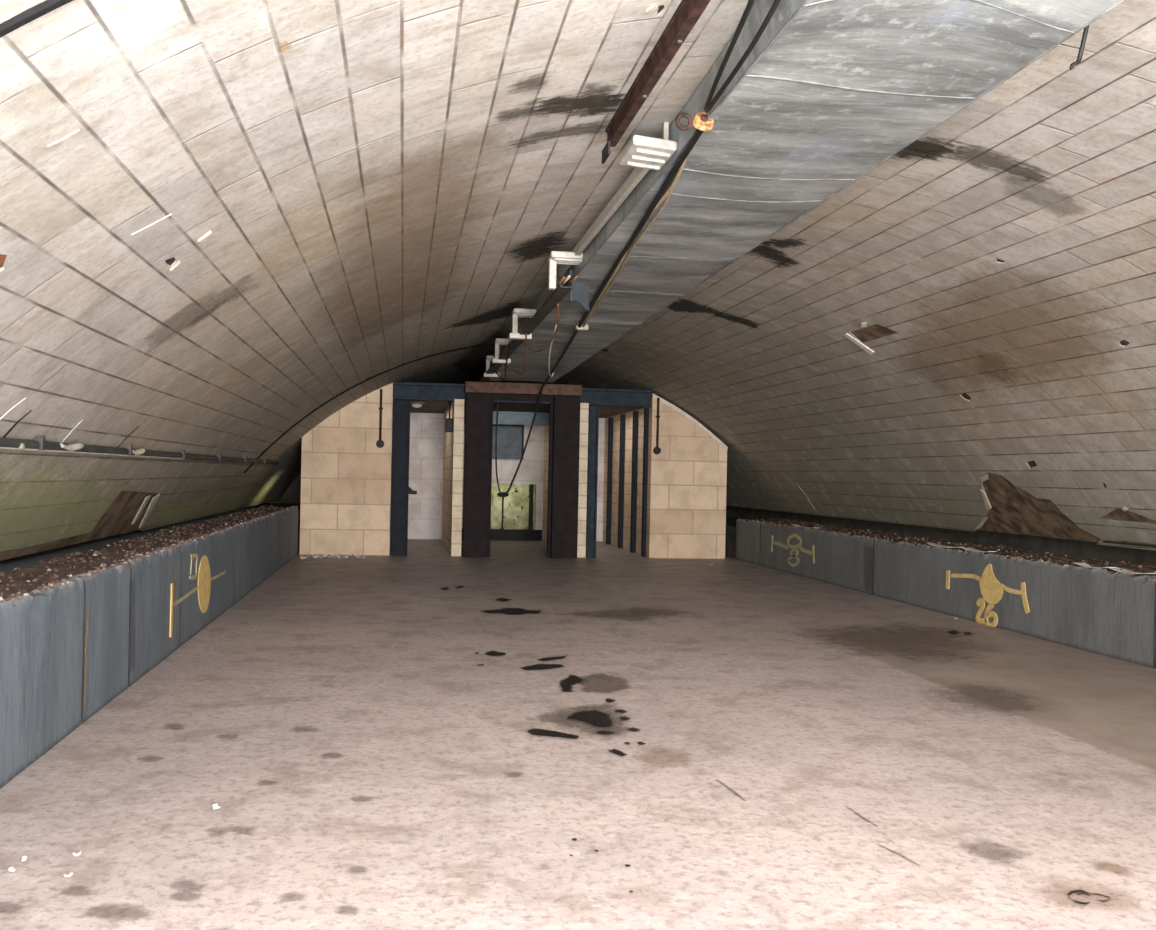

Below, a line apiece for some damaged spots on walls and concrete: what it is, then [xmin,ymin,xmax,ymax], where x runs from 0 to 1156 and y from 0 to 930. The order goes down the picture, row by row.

damp [513,76,546,89]
damp [498,84,625,148]
damp [894,137,1046,181]
damp [508,232,569,262]
damp [749,239,804,268]
damp [667,299,759,329]
damp [444,302,521,381]
spalling [975,473,1101,542]